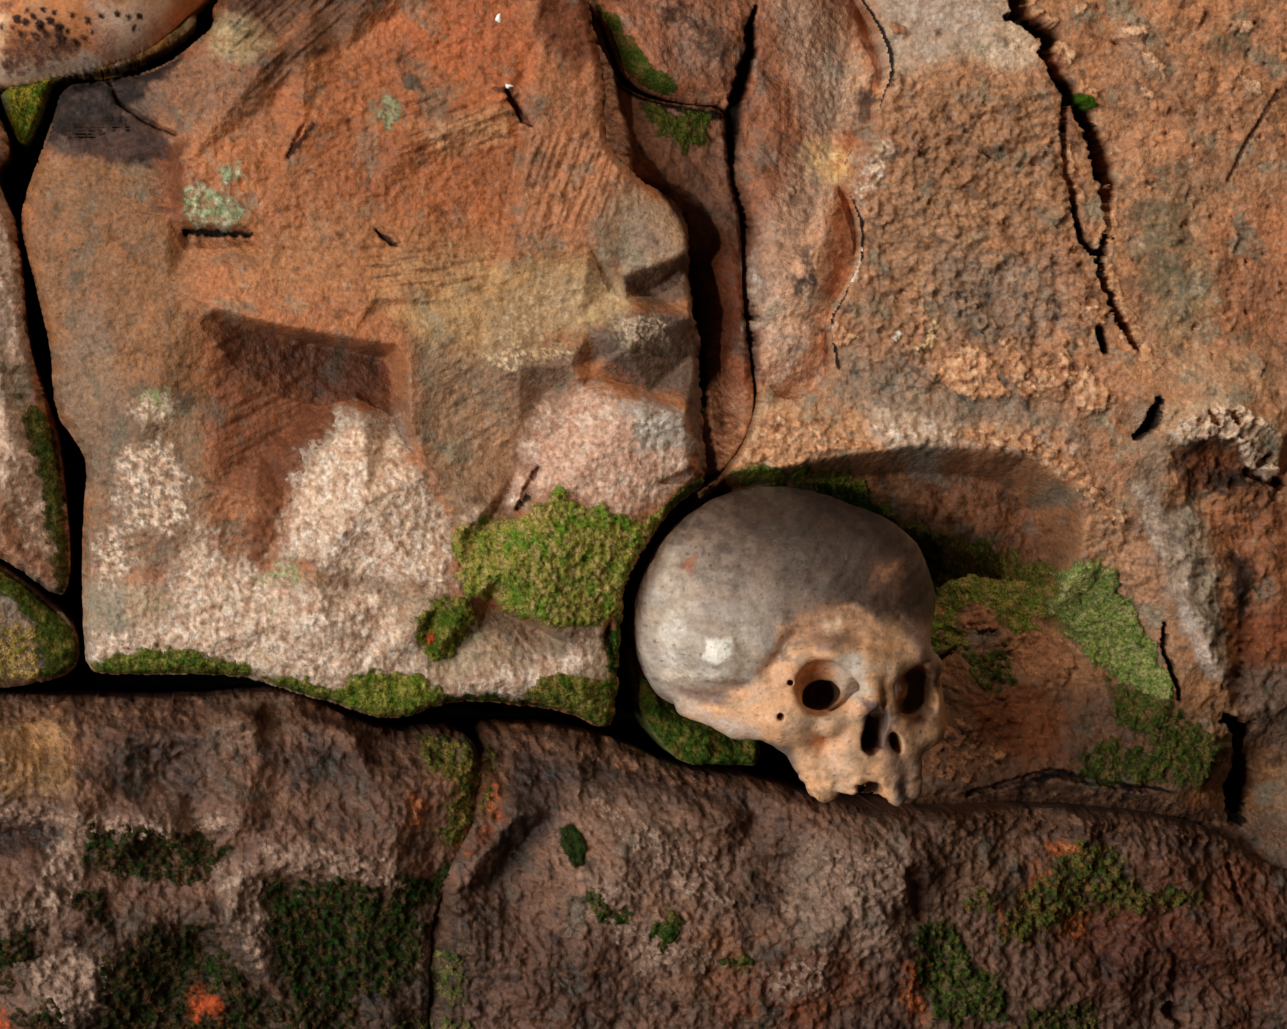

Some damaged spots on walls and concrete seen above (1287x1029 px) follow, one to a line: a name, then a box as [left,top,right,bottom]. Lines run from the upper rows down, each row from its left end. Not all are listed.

crack [1003,13,1136,354]
crack [1132,396,1164,441]